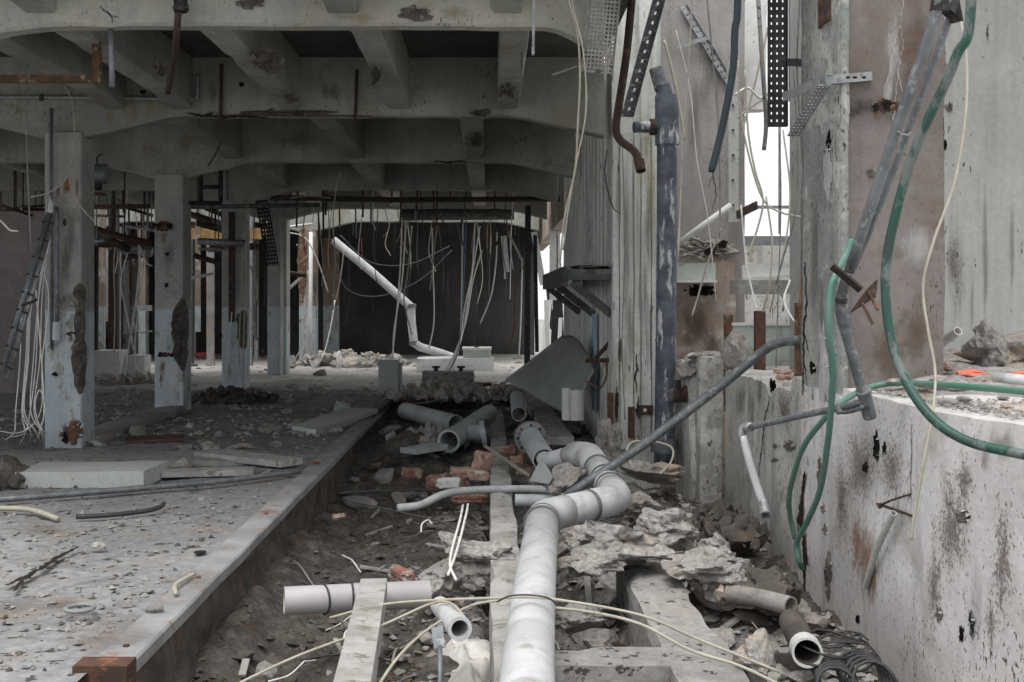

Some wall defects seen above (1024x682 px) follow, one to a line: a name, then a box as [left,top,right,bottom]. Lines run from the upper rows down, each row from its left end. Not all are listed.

spalling [397,4,434,21]
spalling [872,97,899,117]
spalling [51,284,87,394]
spalling [157,299,189,373]
spalling [229,212,248,351]
crack [801,261,809,395]